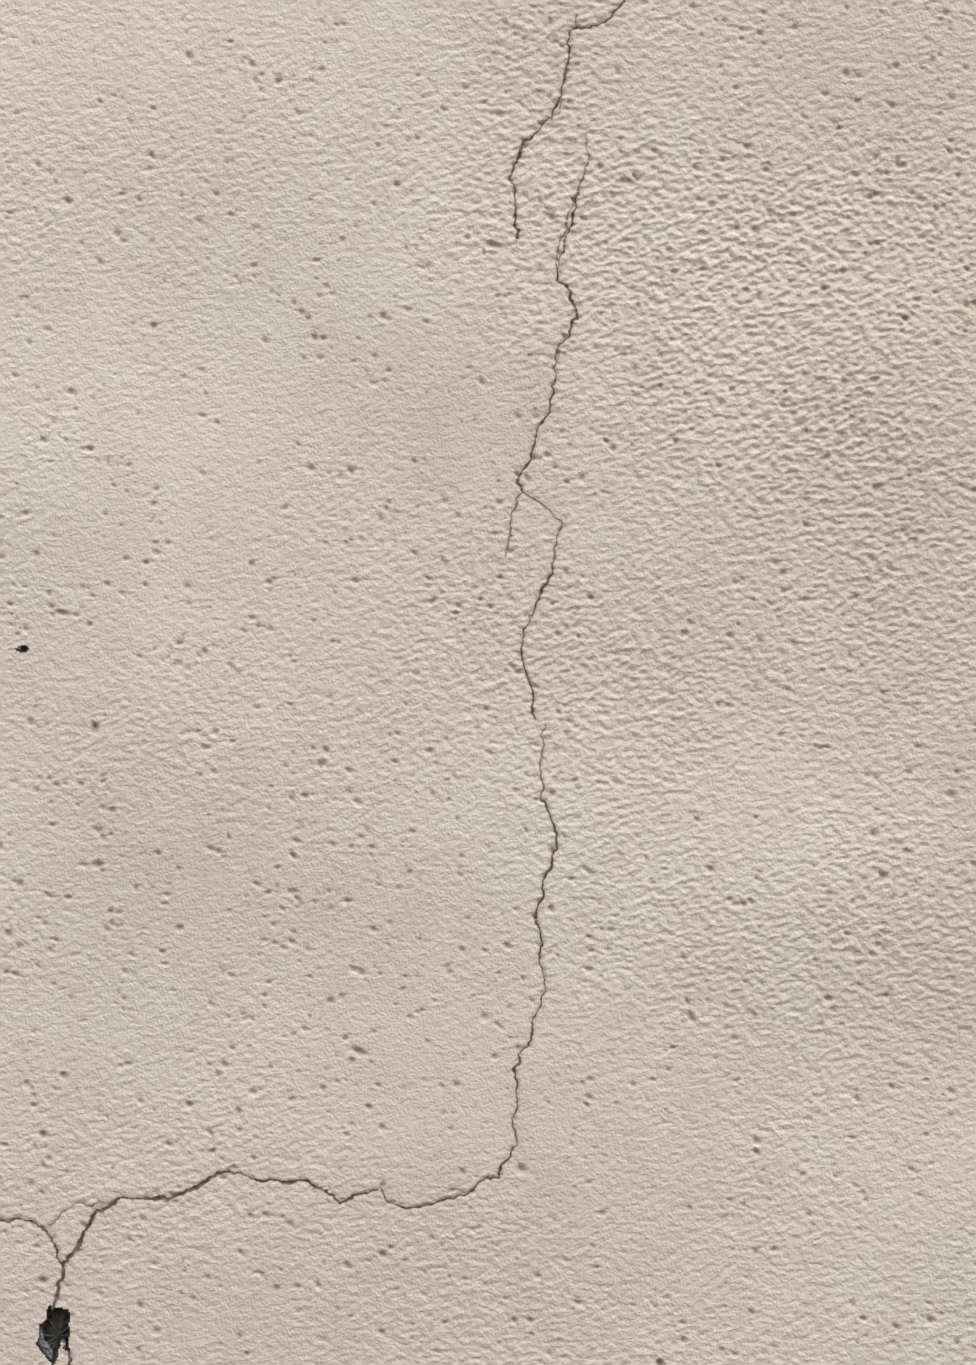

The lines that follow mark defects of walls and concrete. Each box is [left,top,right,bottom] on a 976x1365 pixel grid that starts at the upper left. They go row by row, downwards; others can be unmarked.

crack [509,0,625,254]
crack [0,134,590,1310]
spalling [36,1305,70,1365]